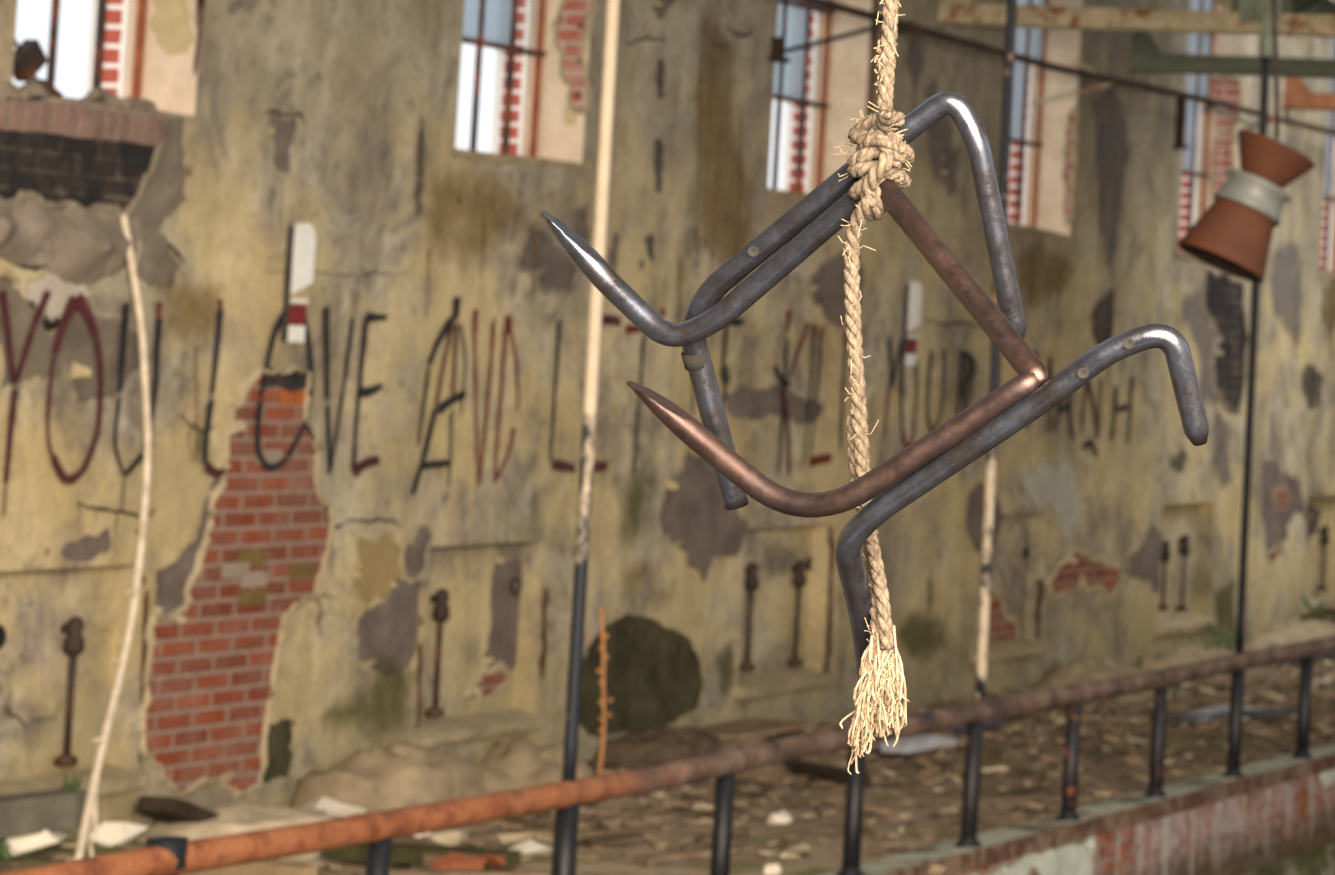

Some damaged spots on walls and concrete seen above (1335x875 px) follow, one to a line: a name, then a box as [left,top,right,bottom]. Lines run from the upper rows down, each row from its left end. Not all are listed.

flaking render [551,0,598,125]
flaking render [0,80,192,290]
flaking render [137,364,335,799]
peeling [353,523,432,675]
flaking render [1046,526,1163,602]
peeling [1261,459,1321,564]
water stain [579,614,703,737]
peeling [970,834,1097,875]